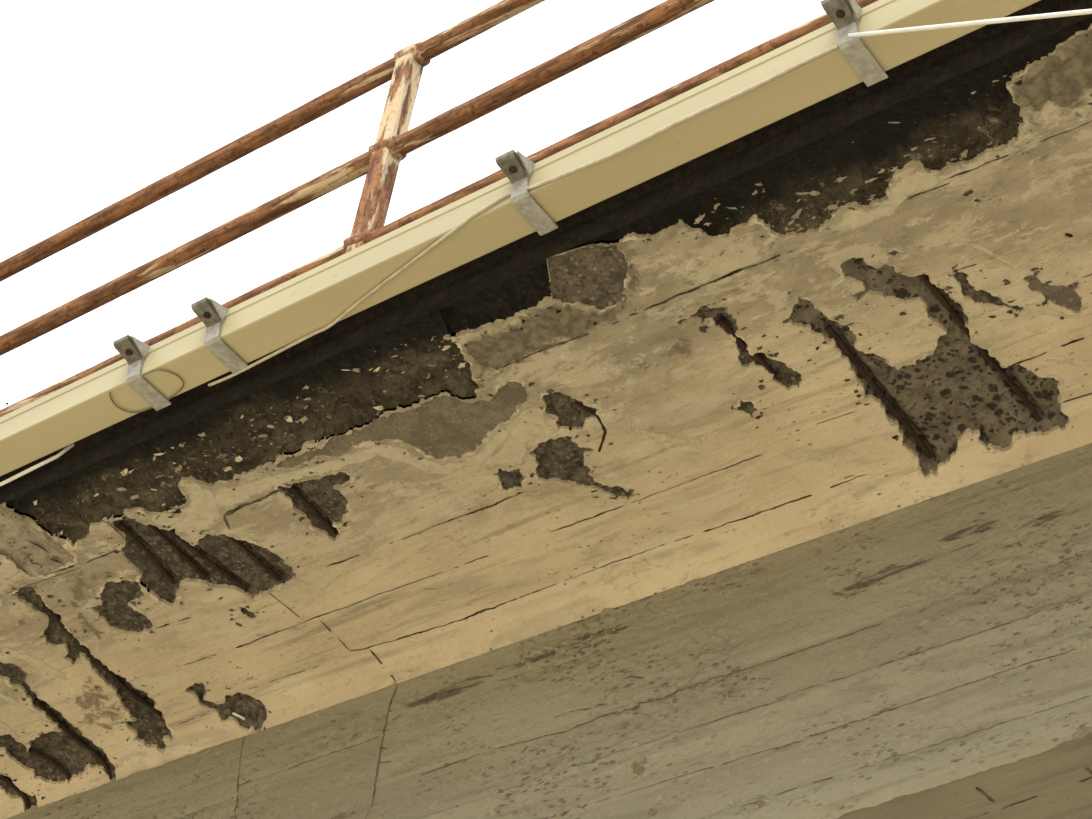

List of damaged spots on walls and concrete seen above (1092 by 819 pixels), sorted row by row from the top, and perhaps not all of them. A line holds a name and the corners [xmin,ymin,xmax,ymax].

spalling [0,16,1092,641]
spalling [0,652,118,812]
spalling [11,585,176,755]
spalling [179,681,271,733]
crack [174,455,885,819]
crack [540,648,1092,819]